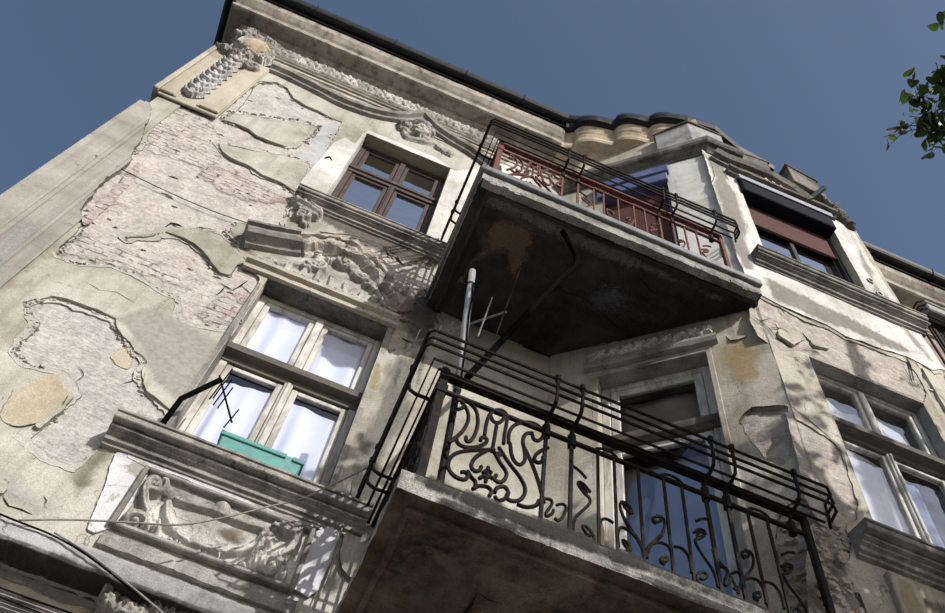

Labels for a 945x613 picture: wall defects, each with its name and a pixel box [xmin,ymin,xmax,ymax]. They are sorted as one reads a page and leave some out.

flaking render [53,82,341,336]
corrosion [474,220,531,275]
damp [408,288,436,344]
crack [753,300,824,341]
flaking render [0,289,175,473]
crack [844,335,921,389]
damp [358,357,424,472]
crack [739,405,842,447]
flaking render [741,408,865,613]